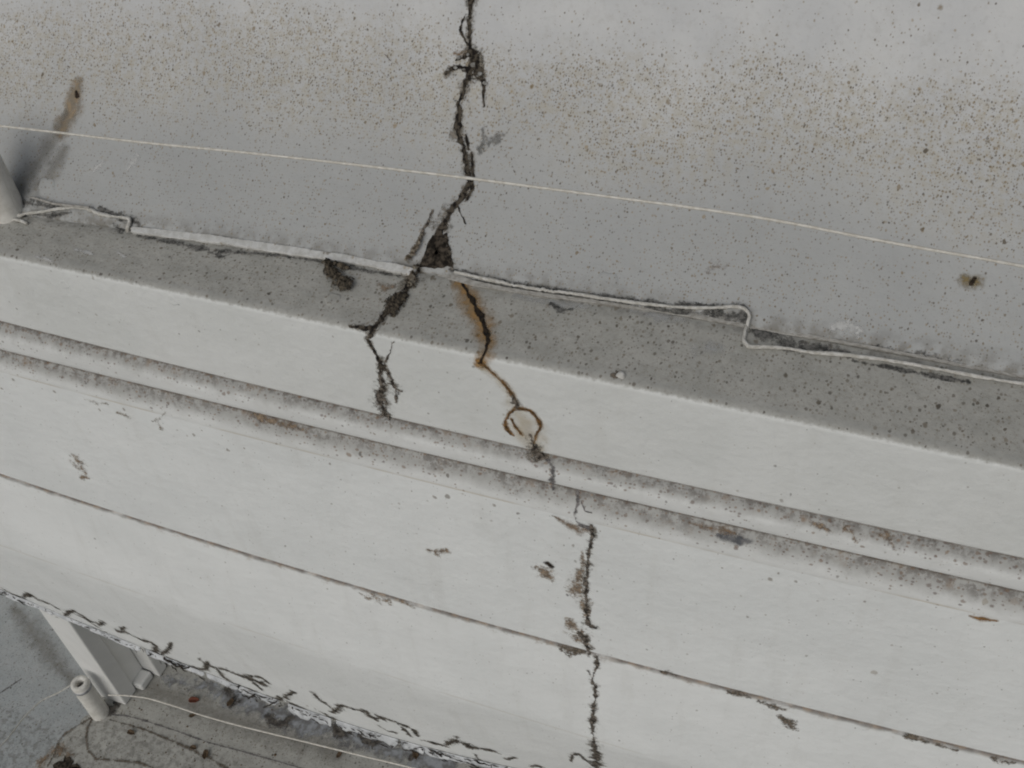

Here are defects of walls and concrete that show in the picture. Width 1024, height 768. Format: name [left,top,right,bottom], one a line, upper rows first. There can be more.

crack [349,0,604,768]
rust [452,281,542,444]
peeling [0,590,512,768]